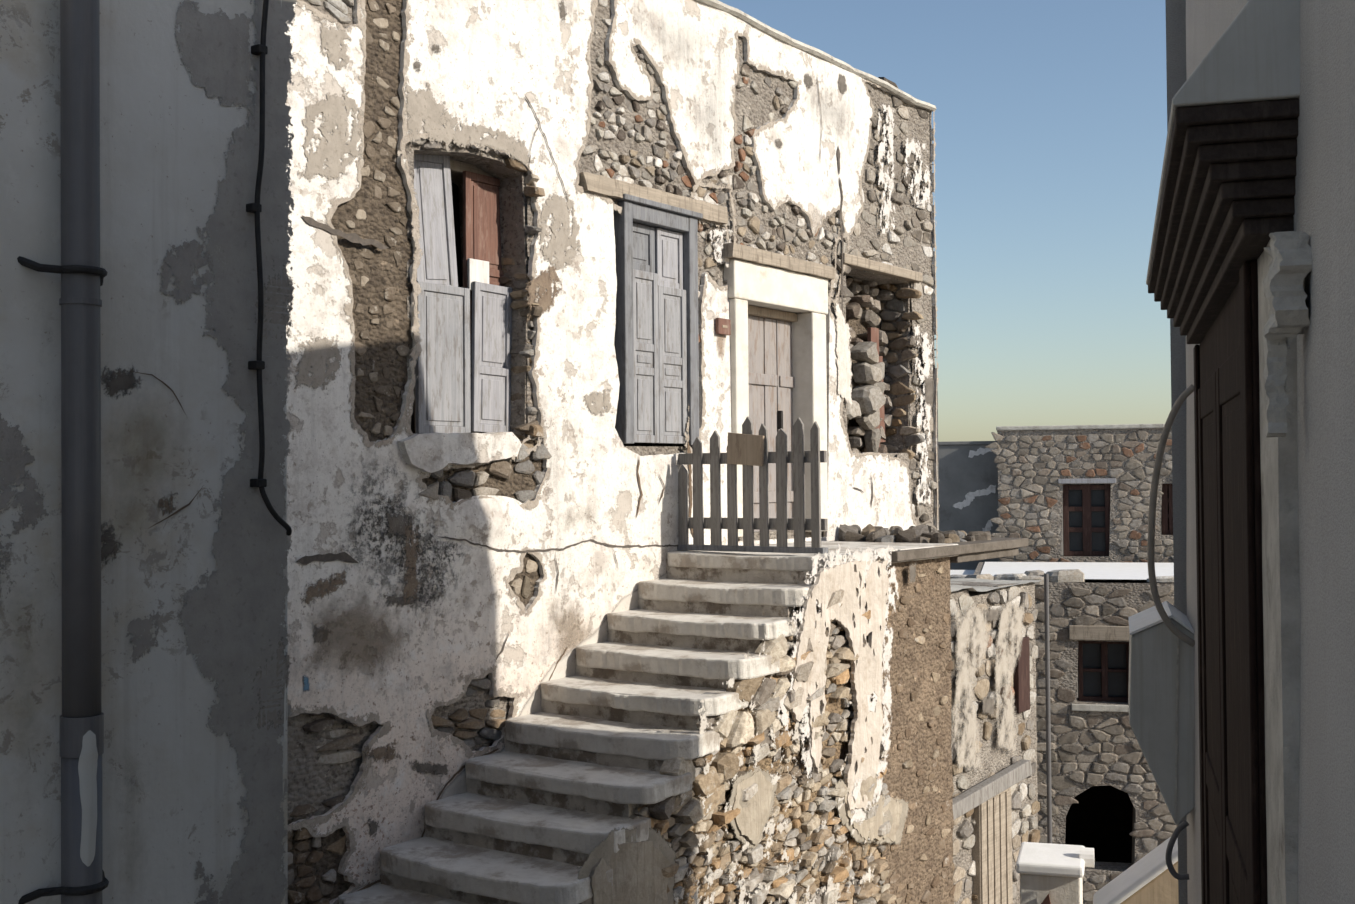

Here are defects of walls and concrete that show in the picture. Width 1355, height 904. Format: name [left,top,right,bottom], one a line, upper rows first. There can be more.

peeling [0,414,49,606]
peeling [126,0,940,904]
crack [437,441,693,594]